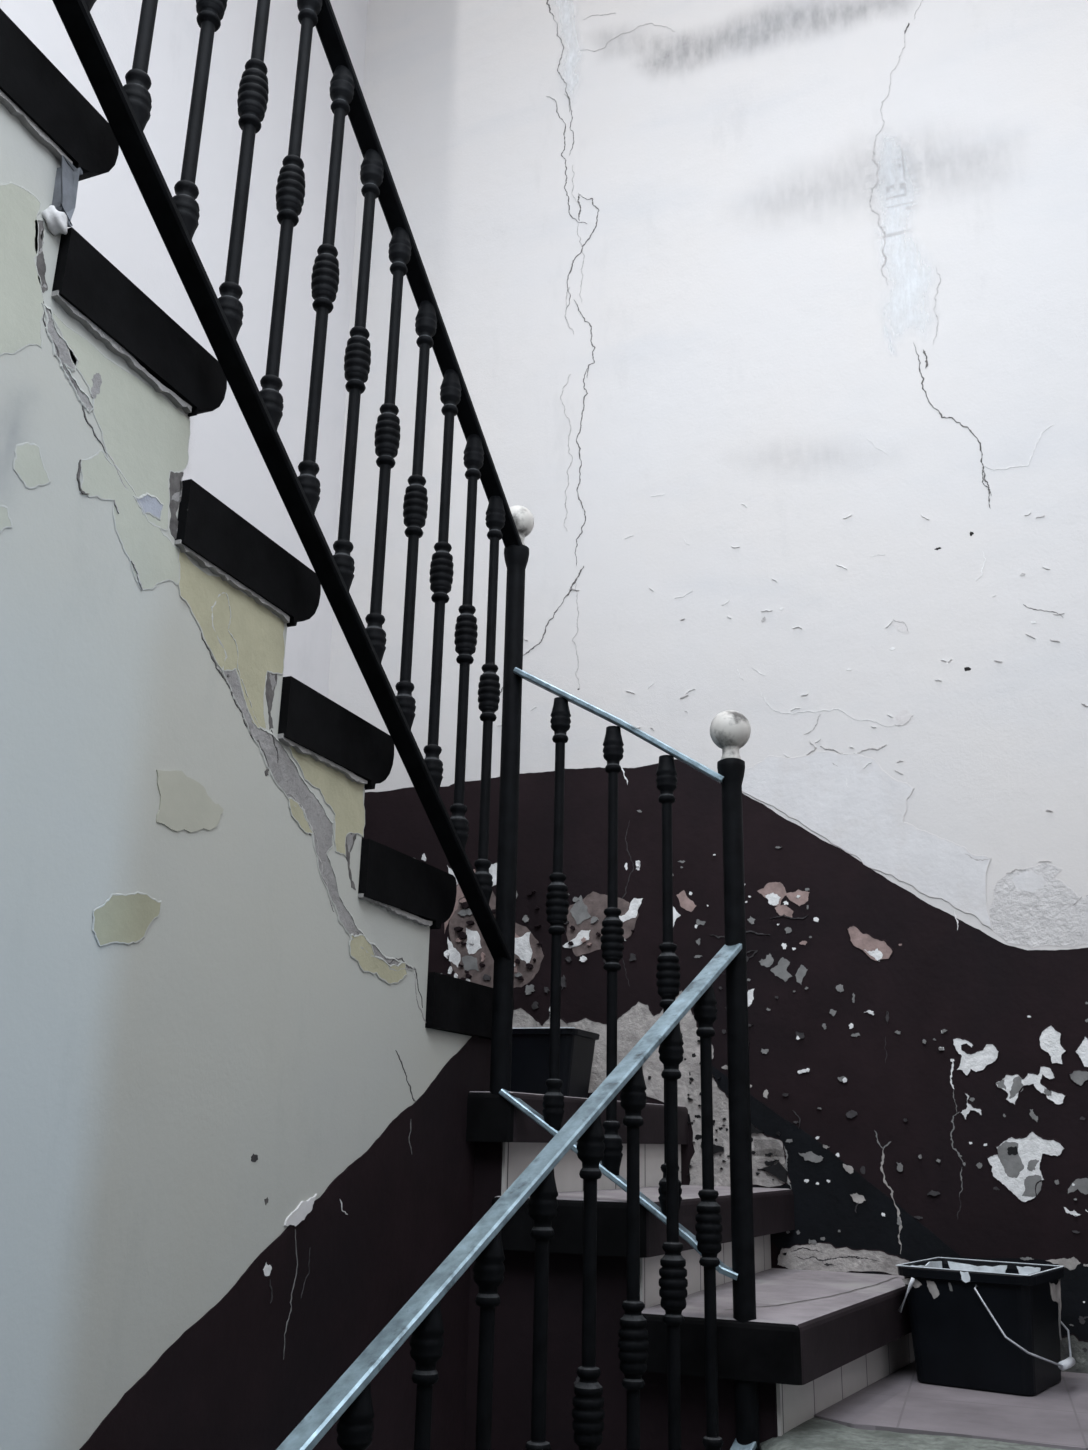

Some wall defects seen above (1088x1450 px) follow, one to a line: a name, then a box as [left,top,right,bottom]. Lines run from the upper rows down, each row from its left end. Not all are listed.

crack [869,0,923,285]
crack [524,0,671,690]
crack [914,268,1051,509]
peeling [0,182,415,985]
peeling [444,867,494,988]
peeling [512,889,683,1094]
spalling [642,1008,730,1187]
peeling [745,882,819,1011]
peeling [846,925,902,962]
peeling [742,694,1088,949]
peeling [922,1002,1088,1233]
spalling [776,1230,910,1276]